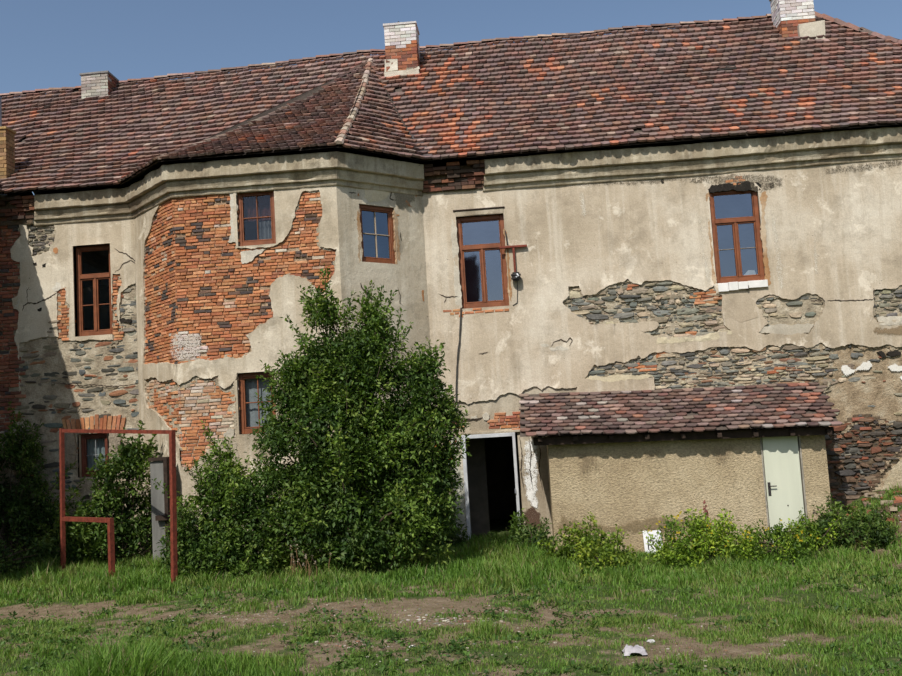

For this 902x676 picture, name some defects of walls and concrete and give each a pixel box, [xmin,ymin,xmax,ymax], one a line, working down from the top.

crack [22,289,58,311]
flaking render [0,190,337,526]
peeling [440,380,577,538]
spalling [563,279,902,508]
peeling [313,634,410,665]
peeling [308,597,537,655]